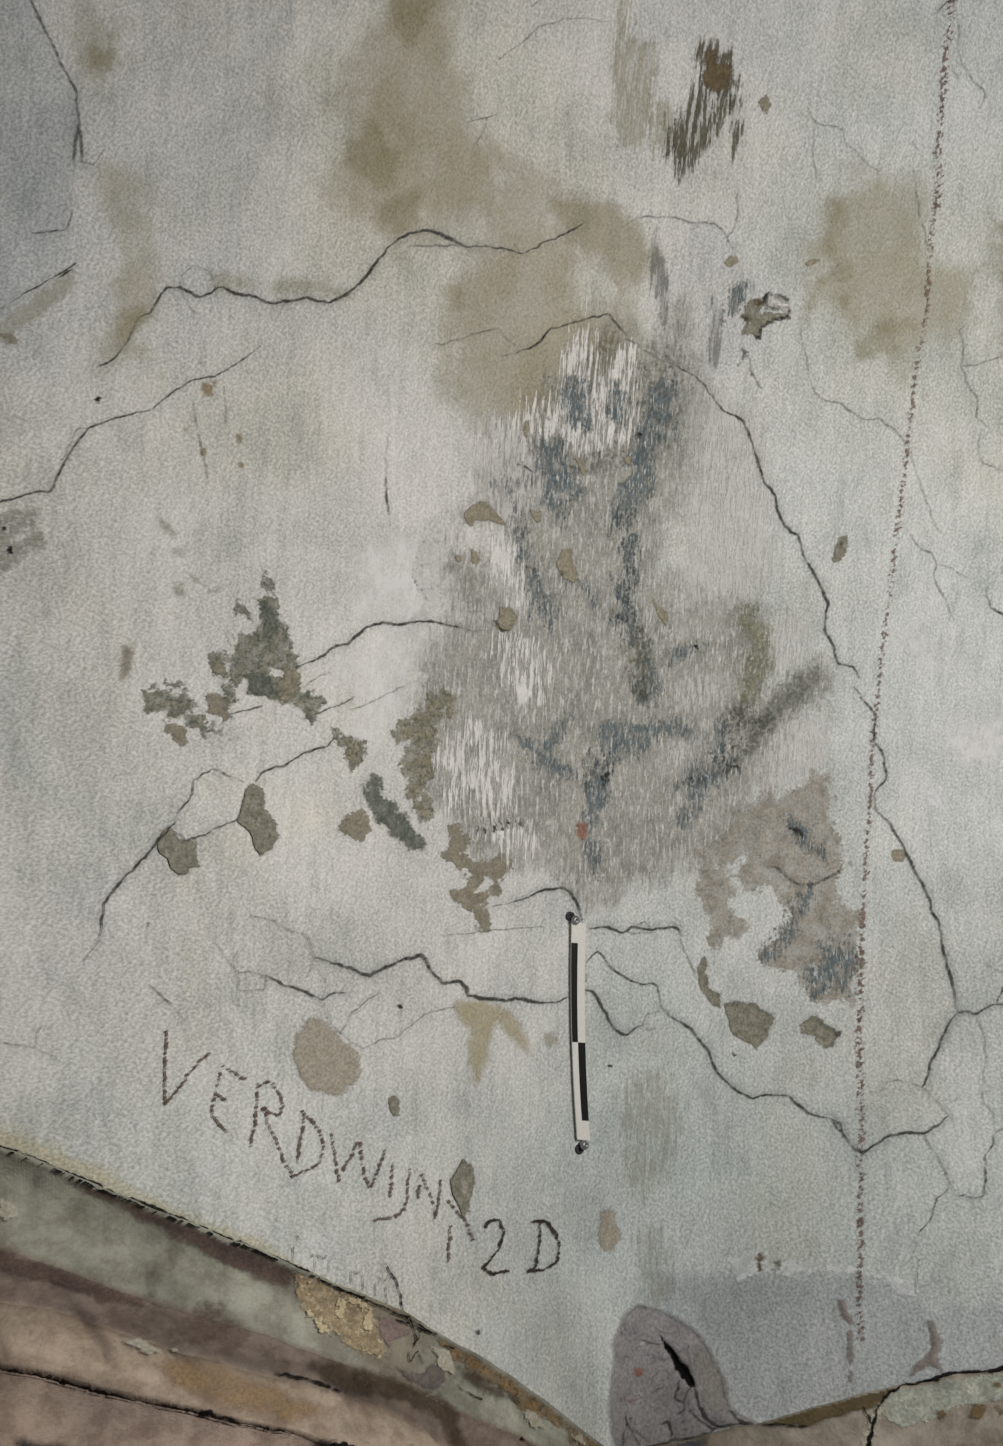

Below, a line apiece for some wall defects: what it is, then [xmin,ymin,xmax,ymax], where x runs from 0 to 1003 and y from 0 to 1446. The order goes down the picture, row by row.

crack [31,0,89,164]
damp [370,6,487,211]
damp [608,0,772,184]
crack [100,224,582,366]
spalling [720,281,791,340]
crack [0,358,245,503]
damp [408,206,834,913]
peeling [142,571,517,933]
crack [221,313,1003,1232]
peeling [694,769,866,1056]
peeling [294,1019,362,1095]
crack [863,1365,1003,1446]